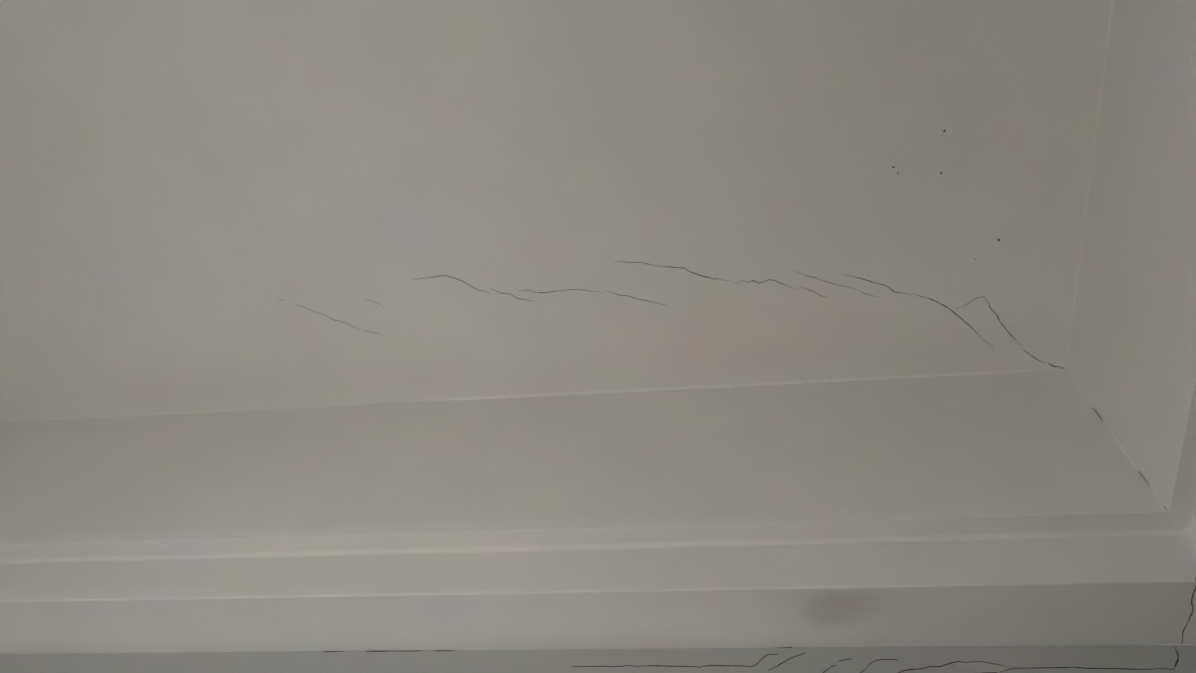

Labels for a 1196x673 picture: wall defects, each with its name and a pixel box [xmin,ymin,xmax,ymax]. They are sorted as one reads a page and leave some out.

crack [413,275,663,305]
crack [614,261,1064,369]
crack [572,576,1196,673]